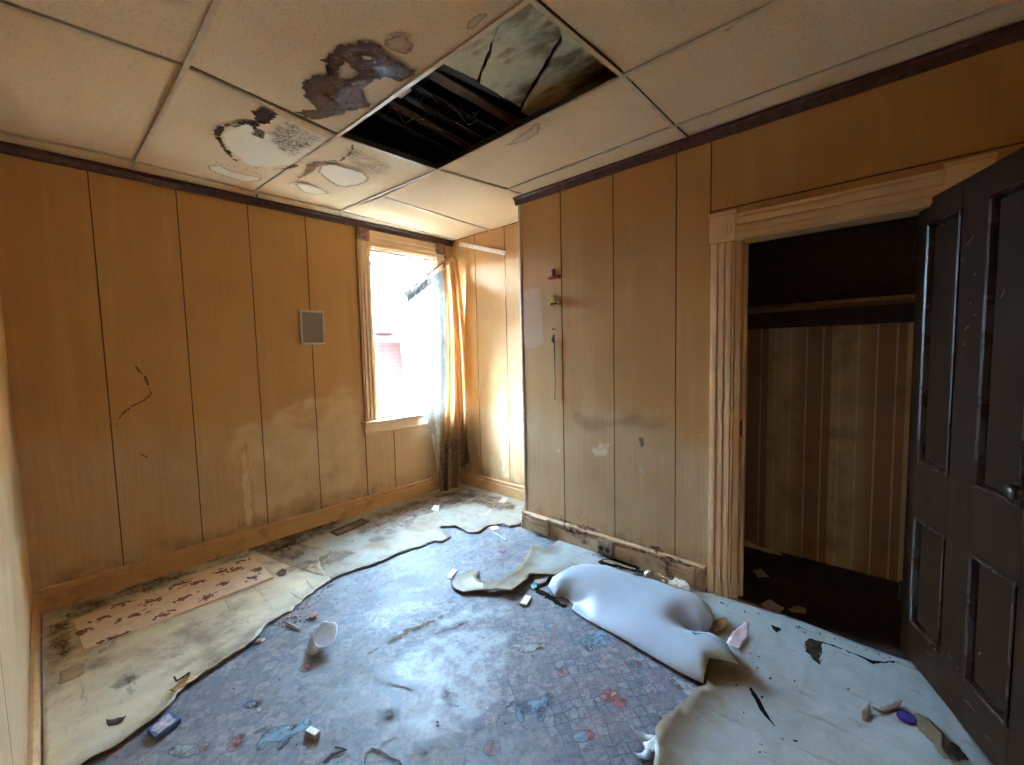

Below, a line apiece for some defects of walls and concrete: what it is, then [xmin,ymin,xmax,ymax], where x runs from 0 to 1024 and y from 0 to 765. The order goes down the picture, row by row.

damp [207,34,416,195]
crack [119,366,152,419]
damp [213,380,367,530]